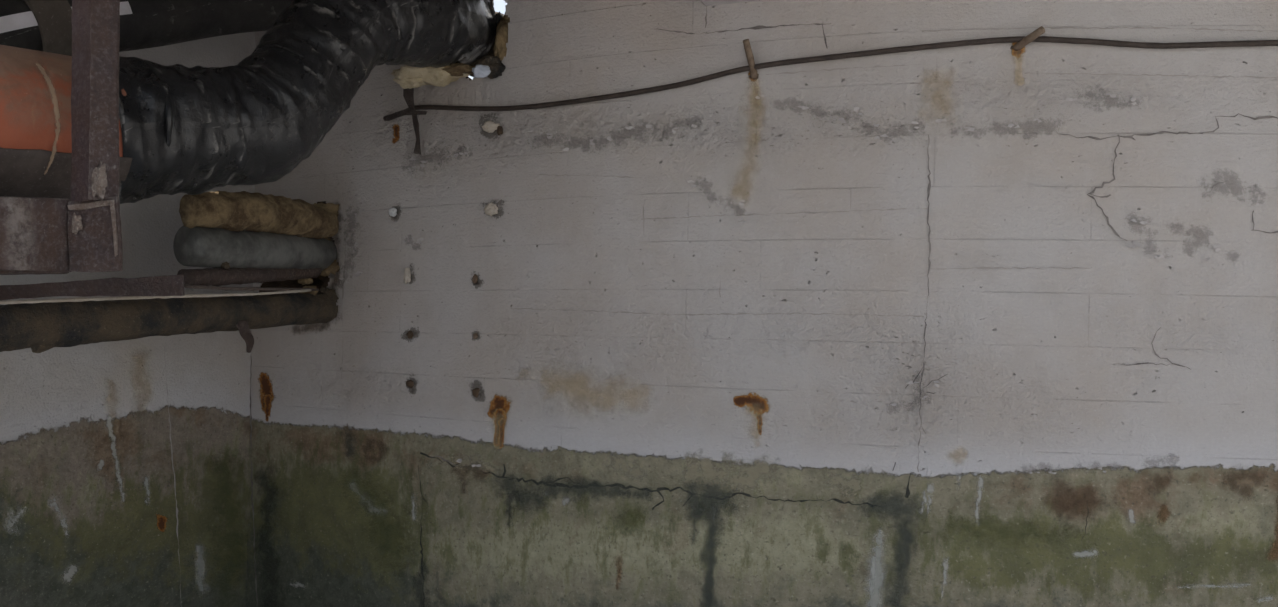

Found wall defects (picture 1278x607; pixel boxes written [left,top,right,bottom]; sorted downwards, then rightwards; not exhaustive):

crack [1061,113,1277,241]
crack [511,135,1092,498]
water stain [98,416,124,502]
corrosion [258,372,275,422]
corrosion [487,394,511,449]
water stain [456,467,651,527]
crack [418,452,700,607]
water stain [687,484,737,607]
corrosion [733,392,769,435]
crack [730,492,868,505]
water stain [861,485,934,607]
water stain [1047,481,1098,517]